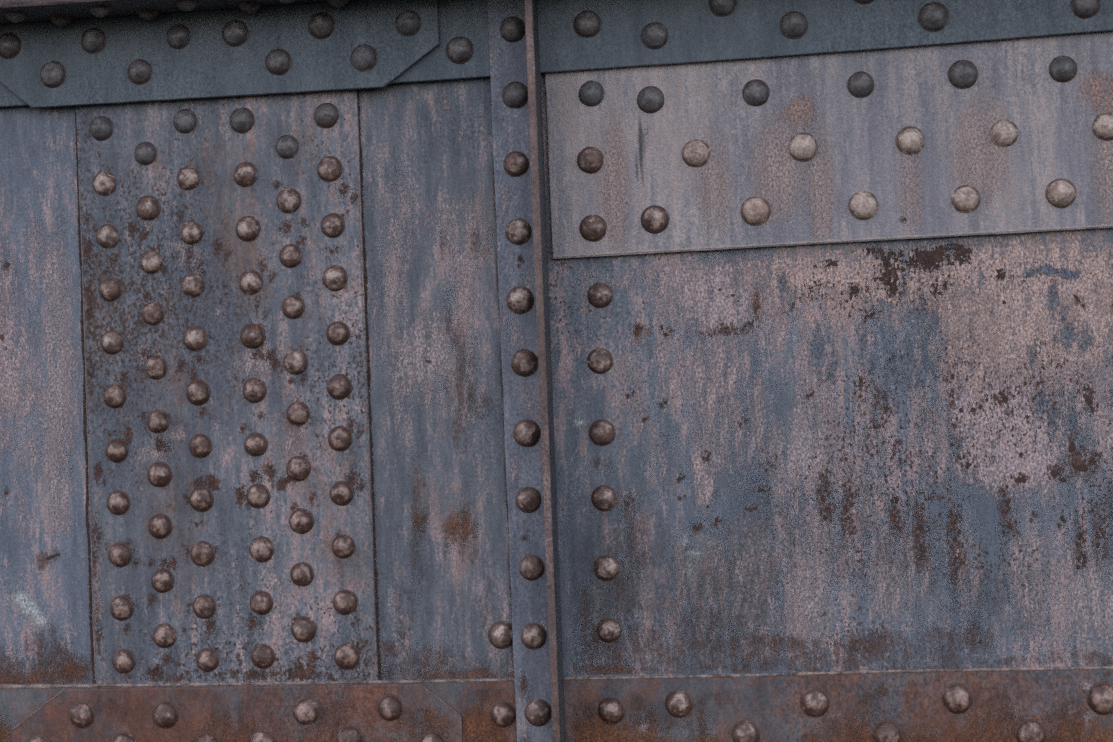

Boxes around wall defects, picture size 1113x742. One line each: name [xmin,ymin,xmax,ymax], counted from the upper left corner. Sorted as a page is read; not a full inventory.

corrosion [251,296,311,386]
corrosion [854,376,892,459]
corrosion [942,366,1013,471]
corrosion [1076,373,1099,416]
corrosion [236,459,291,509]
corrosion [817,467,856,538]
corrosion [888,495,930,573]
corrosion [947,505,966,585]
corrosion [996,472,1038,535]
corrosion [1044,430,1102,482]
corrosion [1056,511,1107,569]
corrosion [147,650,343,682]